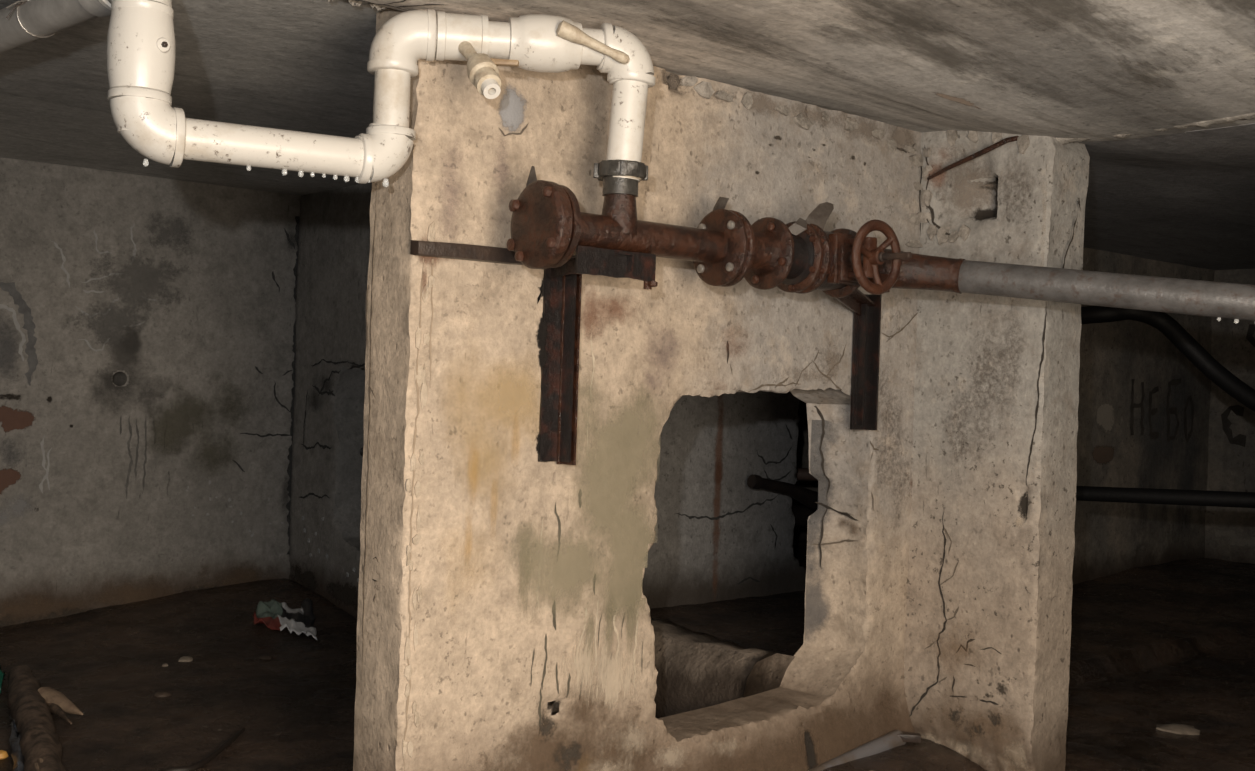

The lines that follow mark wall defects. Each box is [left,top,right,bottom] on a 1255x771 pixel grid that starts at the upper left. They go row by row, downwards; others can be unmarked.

damp [827,0,978,72]
damp [67,256,180,400]
damp [120,397,243,523]
crack [233,189,377,680]
damp [496,309,656,771]
crack [882,313,918,341]
crack [909,513,1001,717]
crack [1016,303,1047,524]